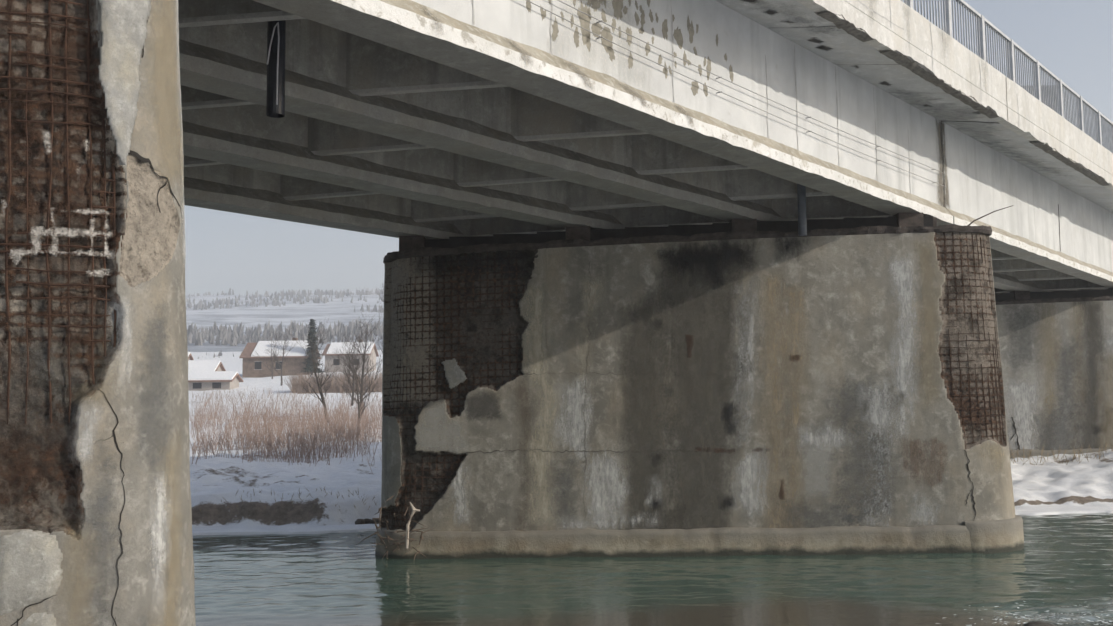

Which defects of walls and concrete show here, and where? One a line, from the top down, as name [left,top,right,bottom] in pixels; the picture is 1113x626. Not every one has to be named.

crack [11,594,58,626]
spalling [0,0,180,540]
crack [97,389,125,626]
crack [128,150,182,214]
spalling [381,249,538,532]
leakage [452,467,467,521]
leakage [526,244,760,530]
leakage [791,260,917,528]
crack [964,450,976,519]
spalling [934,232,1007,449]